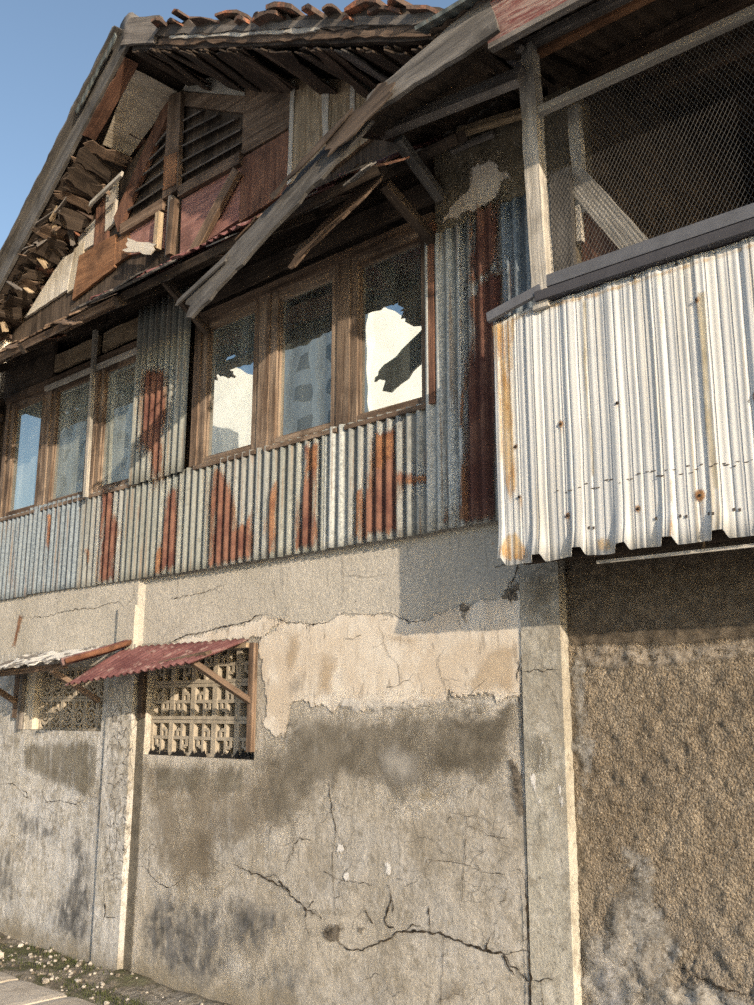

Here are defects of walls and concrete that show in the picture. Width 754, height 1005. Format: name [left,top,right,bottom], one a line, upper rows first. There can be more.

peeling [441,159,510,222]
rust [460,205,521,523]
rust [87,489,117,580]
rust [155,490,177,572]
rust [208,470,253,566]
rust [355,430,426,536]
crack [167,582,487,731]
peeling [168,582,522,738]
damp [26,742,95,793]
damp [59,839,89,938]
crack [7,701,551,1005]
damp [123,710,508,979]